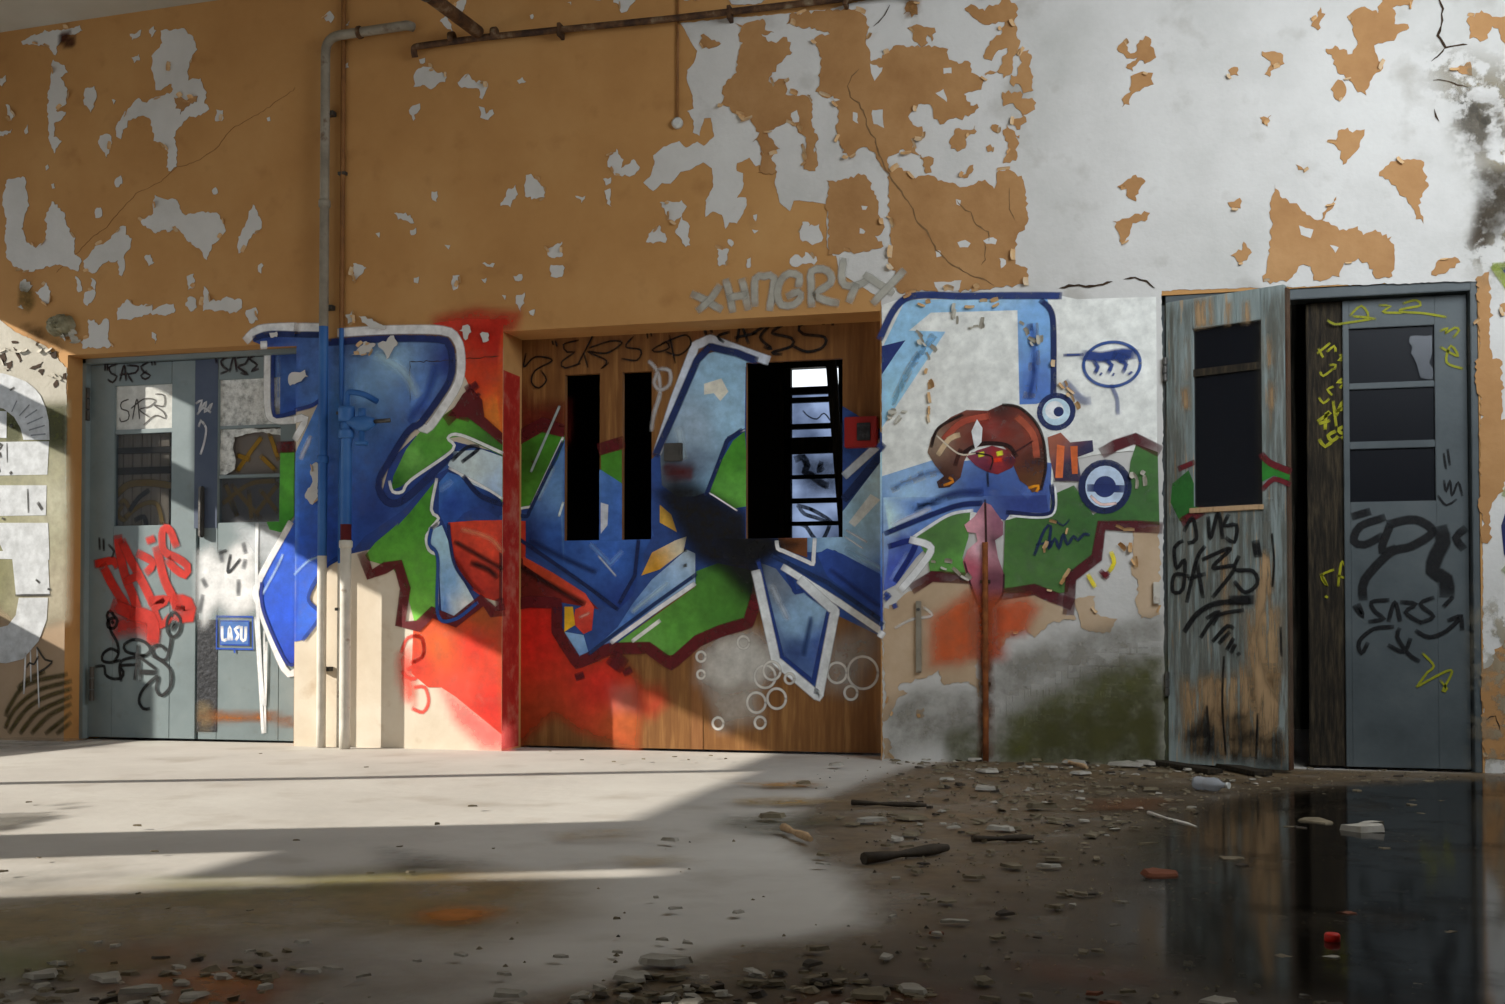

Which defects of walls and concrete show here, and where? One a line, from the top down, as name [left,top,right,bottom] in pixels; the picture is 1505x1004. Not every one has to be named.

crack [1432,0,1467,121]
peeling [0,24,278,349]
peeling [500,174,546,207]
crack [847,69,1081,424]
damp [1451,73,1505,246]
peeling [0,320,68,508]
peeling [305,462,318,505]
peeling [598,0,1505,773]
crack [1129,470,1147,489]
crack [1042,519,1071,592]
damp [1004,628,1155,696]
damp [1492,617,1505,756]